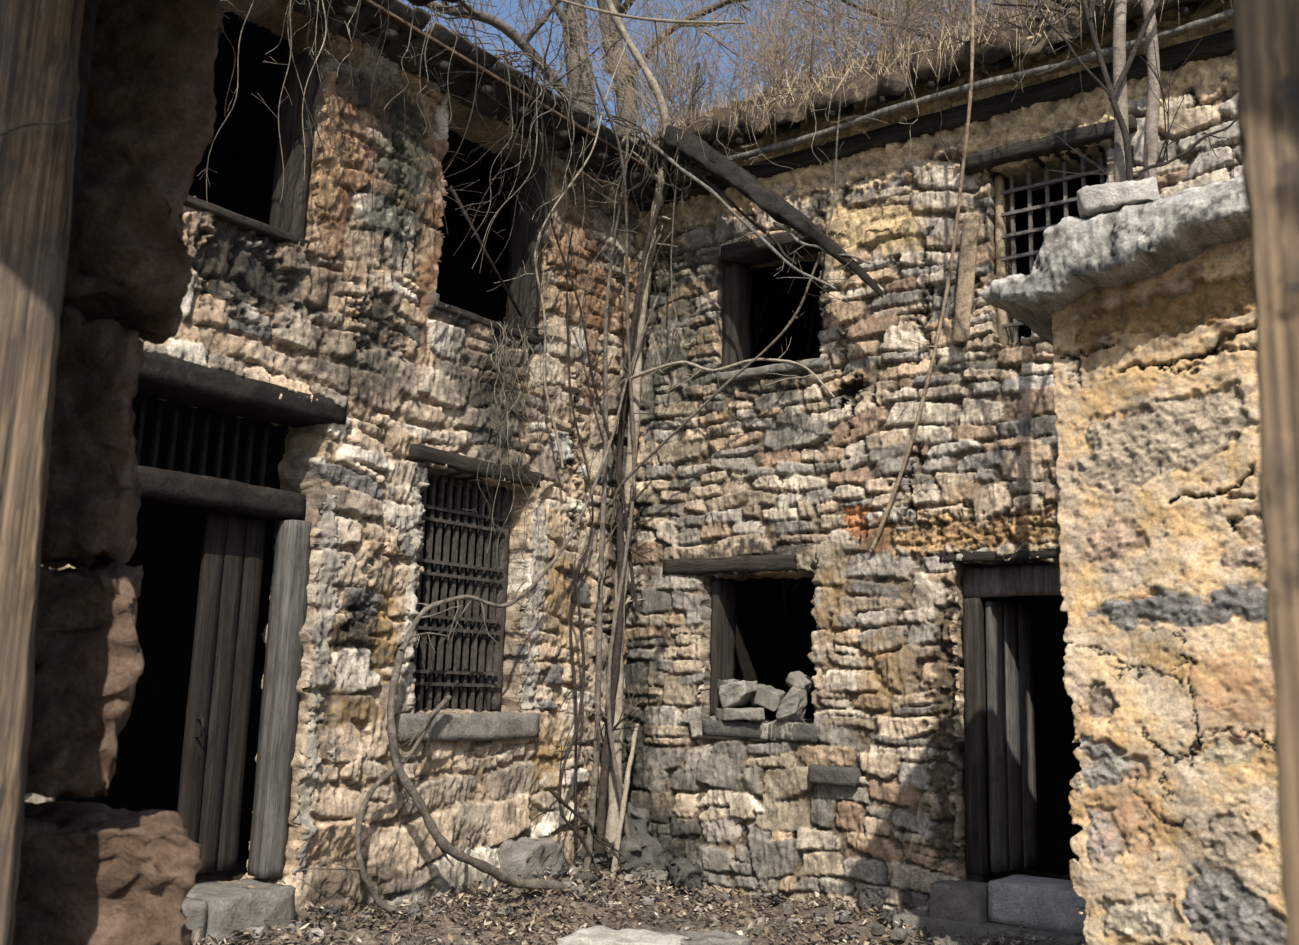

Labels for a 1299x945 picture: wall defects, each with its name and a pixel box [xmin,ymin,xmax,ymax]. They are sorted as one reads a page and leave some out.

crack [1168,471,1254,532]
spalling [1221,544,1266,566]
spalling [1088,581,1266,630]
crack [1071,630,1275,861]
spalling [1102,806,1286,945]